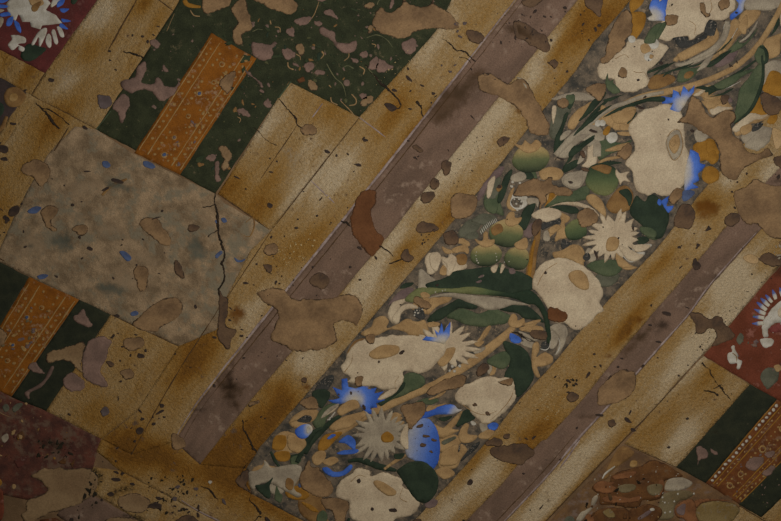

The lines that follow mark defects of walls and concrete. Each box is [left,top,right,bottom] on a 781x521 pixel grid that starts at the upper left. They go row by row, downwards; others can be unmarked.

flaking render [471,68,550,136]
crack [203,193,226,295]
flaking render [347,189,384,260]
flaking render [668,188,701,270]
flaking render [212,291,248,350]
flaking render [243,218,363,359]
flaking render [686,307,735,351]
crack [701,362,731,400]
flaking render [21,439,125,521]
crack [240,420,270,521]